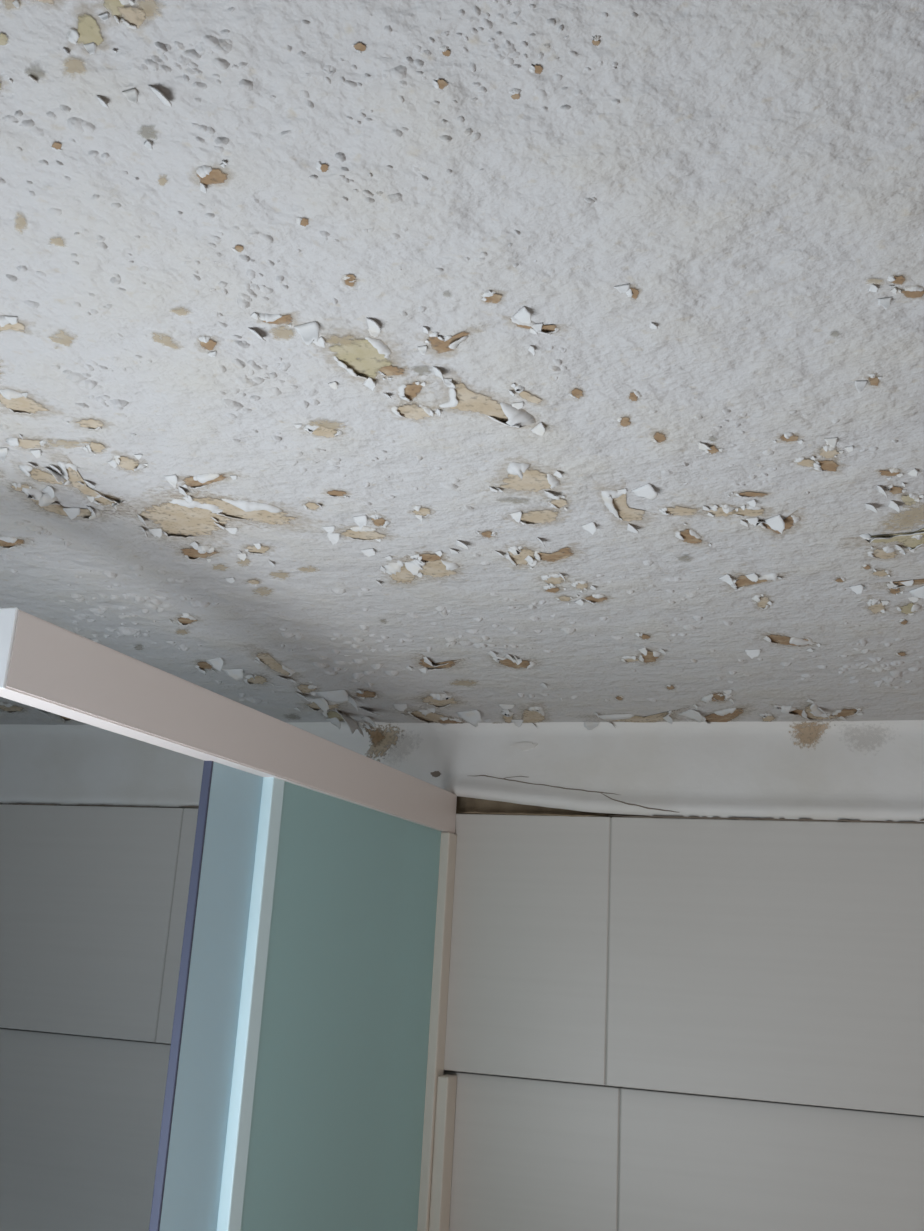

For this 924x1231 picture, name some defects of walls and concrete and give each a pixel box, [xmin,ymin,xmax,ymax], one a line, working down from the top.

peeling [63,0,160,73]
peeling [248,312,546,438]
peeling [0,419,148,520]
peeling [137,473,349,596]
peeling [323,510,469,587]
peeling [477,462,607,606]
peeling [601,483,801,561]
peeling [836,468,924,625]
peeling [194,653,482,761]
peeling [584,690,744,730]
damp [793,722,828,748]
crack [477,775,675,812]